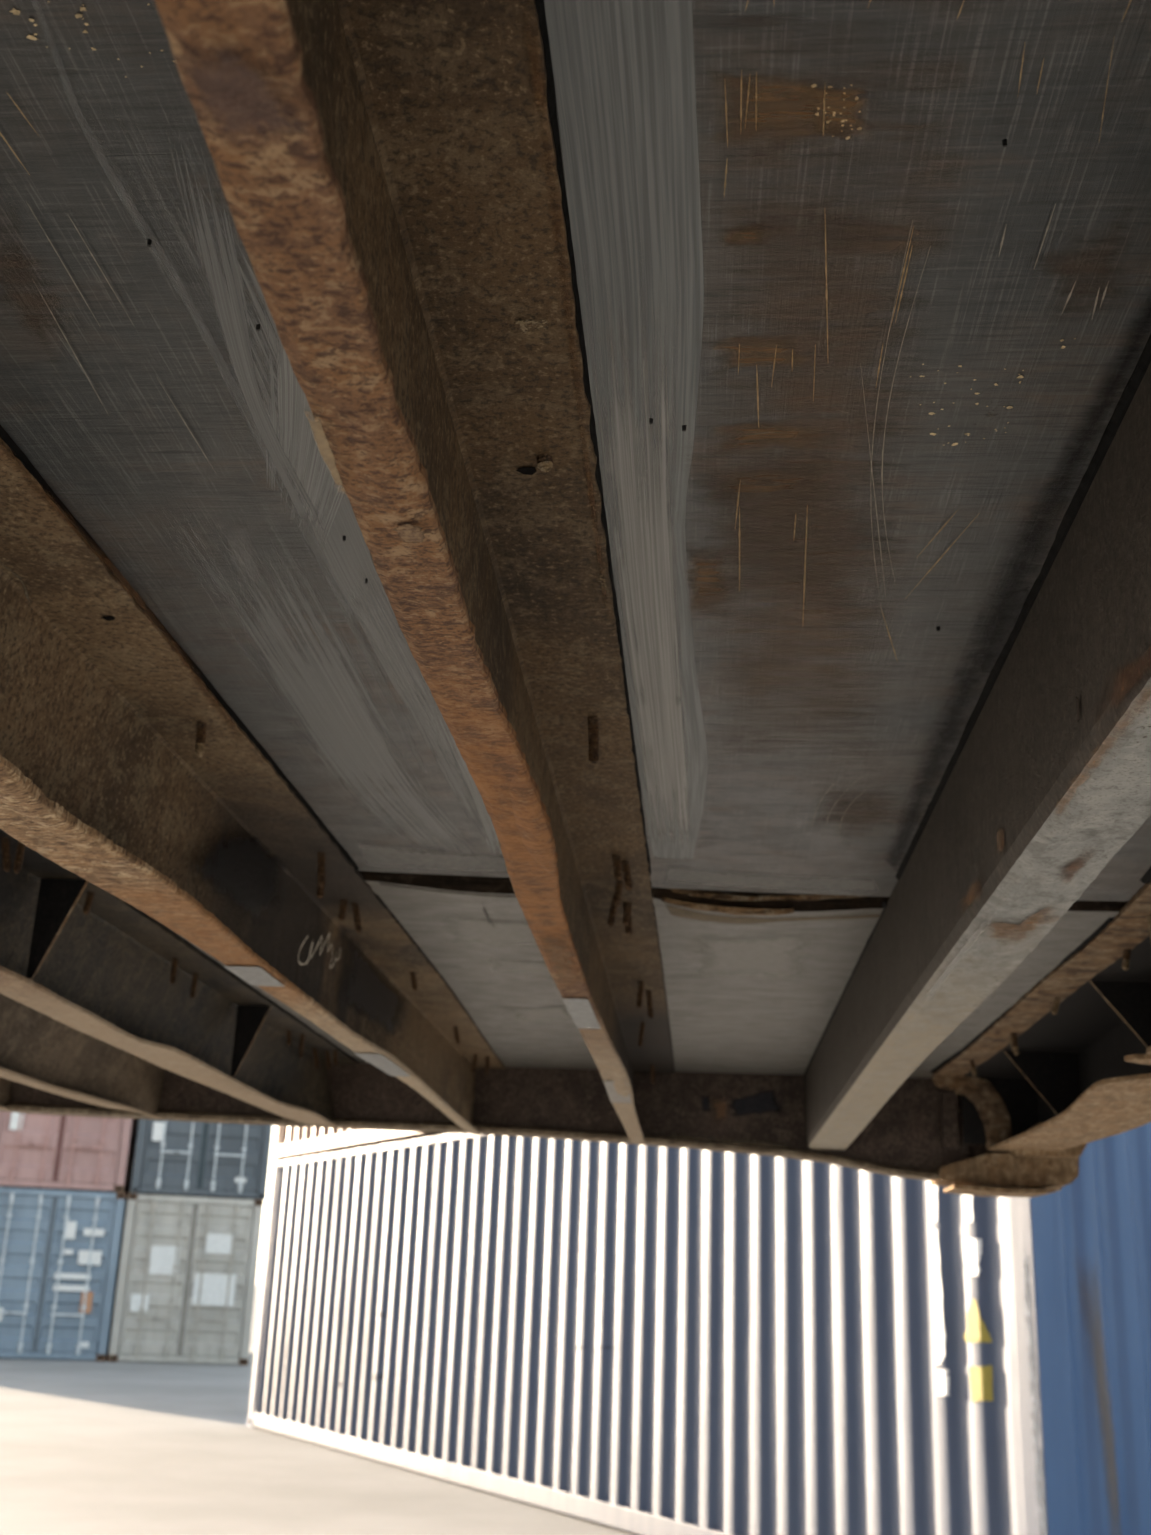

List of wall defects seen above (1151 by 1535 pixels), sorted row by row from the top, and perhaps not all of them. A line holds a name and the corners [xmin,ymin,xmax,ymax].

peeling [10,8,48,48]